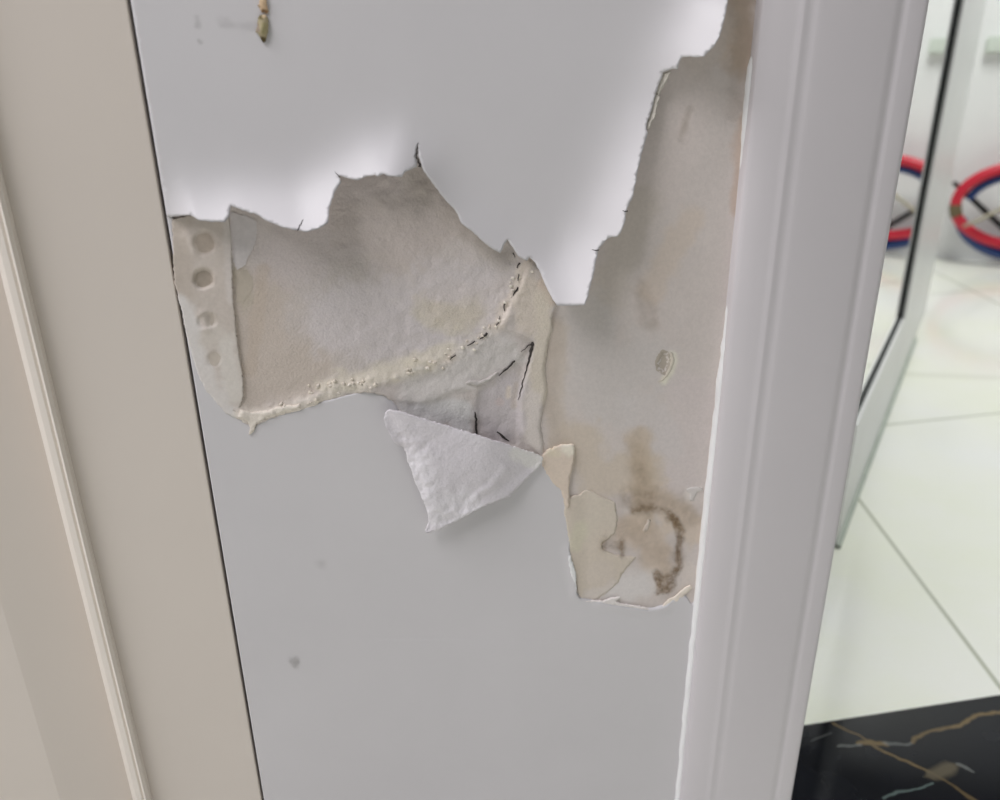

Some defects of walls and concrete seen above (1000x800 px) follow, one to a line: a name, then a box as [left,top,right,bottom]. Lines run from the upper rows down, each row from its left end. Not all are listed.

peeling [131,0,756,610]